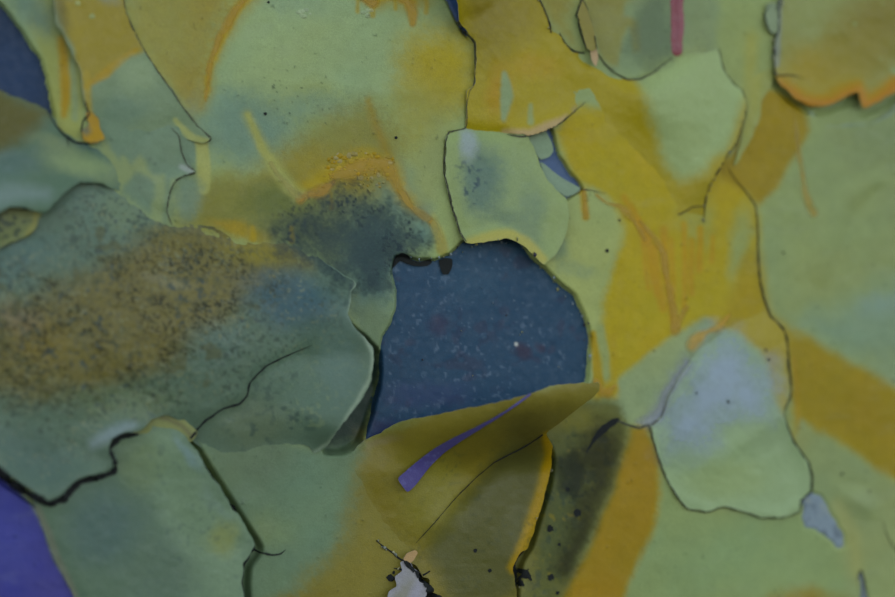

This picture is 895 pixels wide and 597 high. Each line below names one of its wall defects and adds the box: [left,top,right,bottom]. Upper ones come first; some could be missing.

crack [538,0,673,80]
crack [763,0,802,78]
crack [507,103,584,137]
peeling [0,0,374,597]
peeling [352,0,895,597]
crack [586,49,813,519]
crack [190,345,312,439]
crack [205,466,237,513]
crack [241,546,286,597]